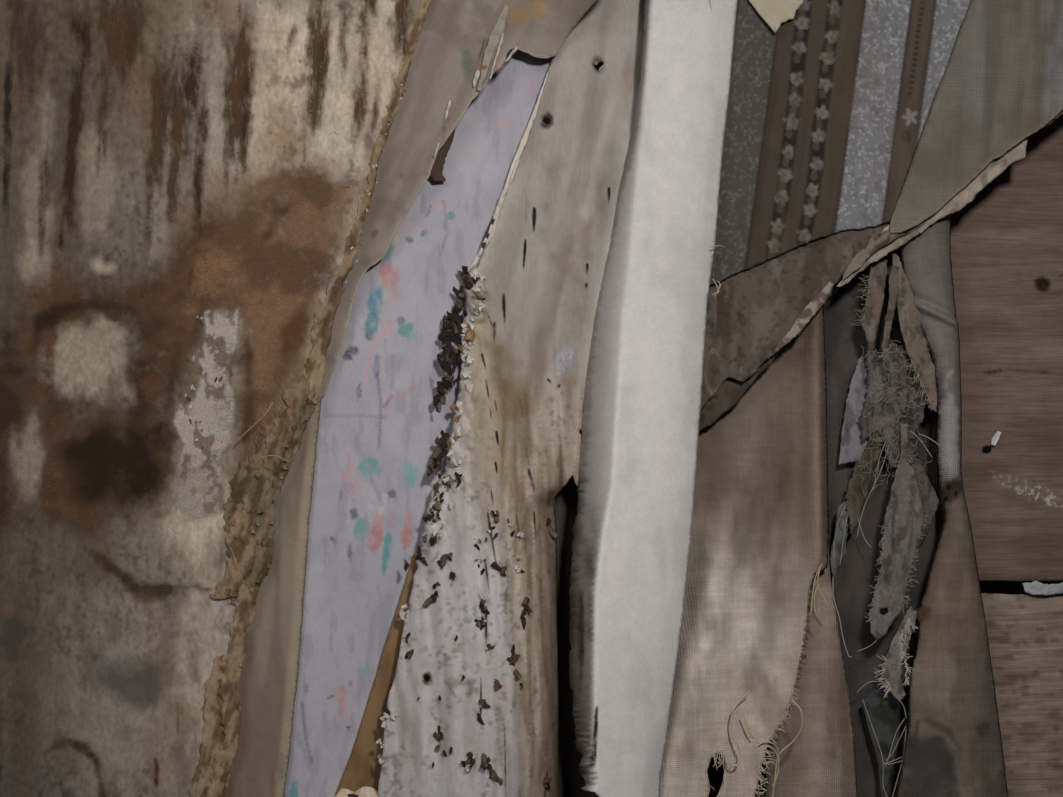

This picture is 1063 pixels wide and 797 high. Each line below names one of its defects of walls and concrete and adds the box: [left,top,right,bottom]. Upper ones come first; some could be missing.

damp [4,0,43,140]
damp [59,0,143,246]
damp [224,10,253,168]
damp [307,0,346,131]
damp [354,72,377,129]
damp [360,0,375,56]
damp [395,0,410,54]
damp [0,50,357,531]
peeling [174,0,433,797]
damp [94,554,174,600]